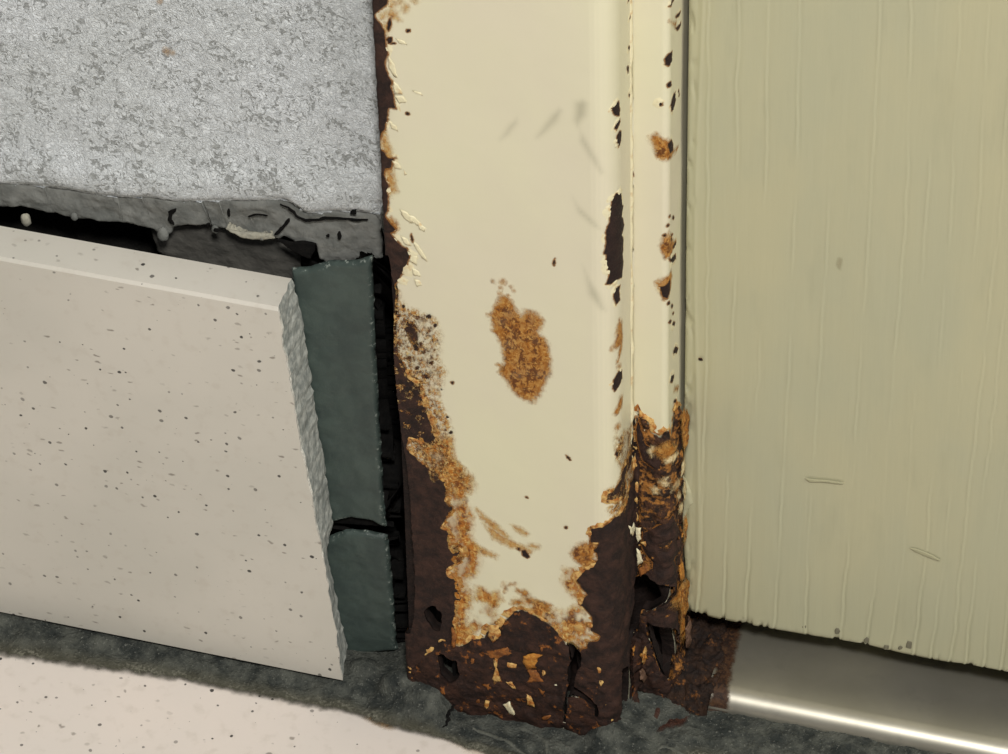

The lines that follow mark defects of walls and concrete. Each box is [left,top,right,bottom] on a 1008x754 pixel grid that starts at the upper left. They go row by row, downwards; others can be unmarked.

peeling [661,50,673,67]
peeling [608,88,631,149]
peeling [652,81,680,116]
peeling [599,186,625,307]
peeling [662,214,677,268]
peeling [657,280,675,331]
corrosion [372,0,743,736]
peeling [609,366,623,392]
peeling [668,342,678,386]
crack [333,517,394,527]